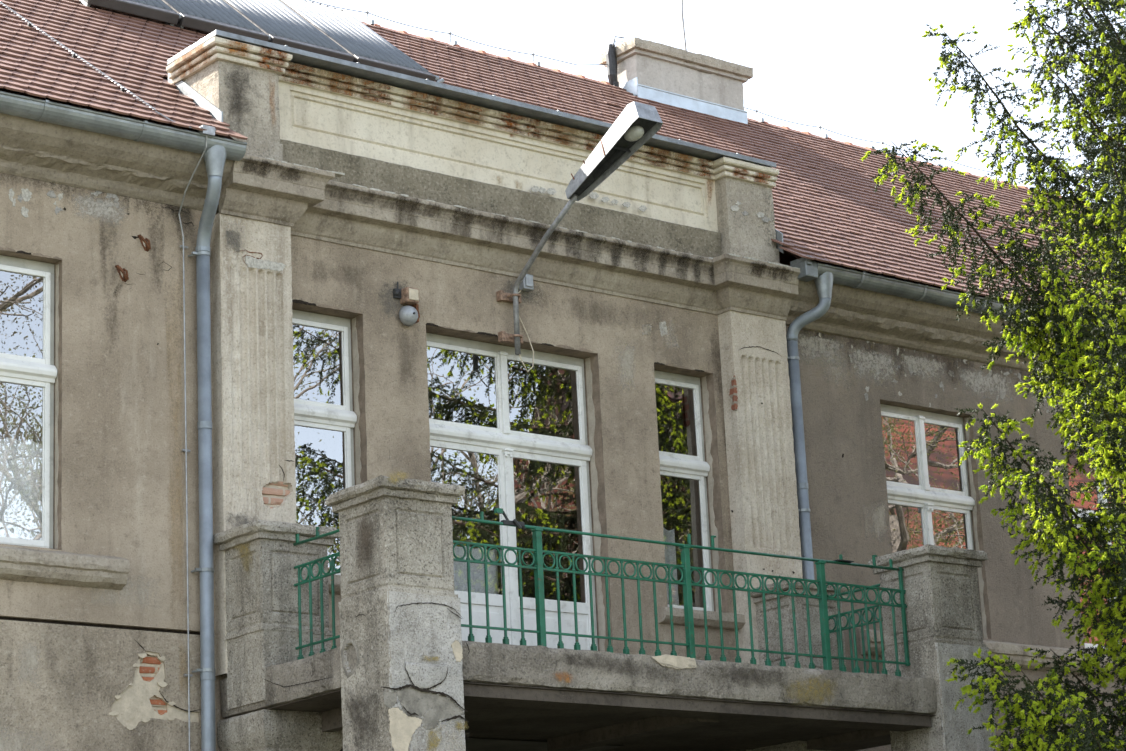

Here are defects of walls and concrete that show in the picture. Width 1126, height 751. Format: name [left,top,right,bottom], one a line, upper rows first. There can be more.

rust [229,40,391,105]
rust [405,91,488,126]
rust [500,113,604,151]
rust [629,146,713,198]
damp [330,188,714,280]
flaking render [729,375,738,411]
flaking render [262,481,290,509]
peeling [654,362,722,612]
flaking render [109,651,199,730]
flaking render [382,687,464,751]